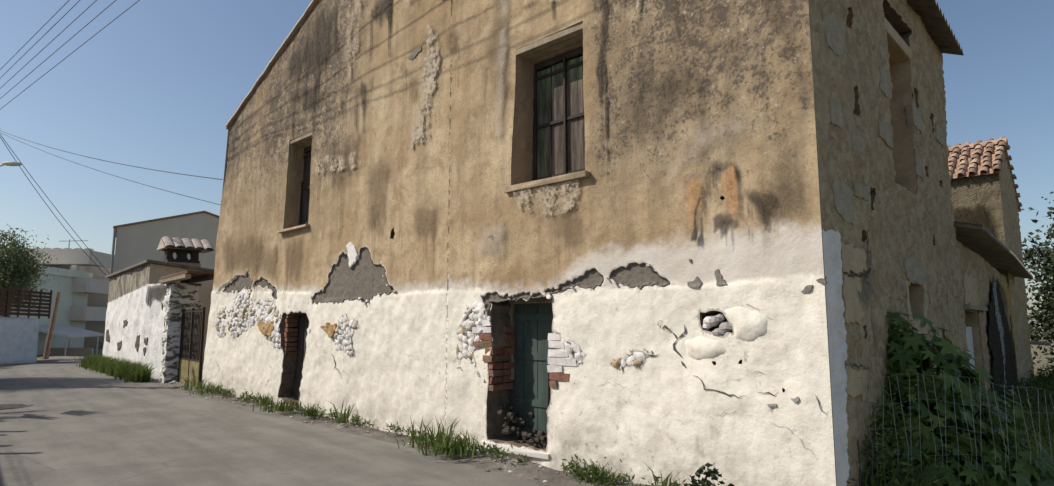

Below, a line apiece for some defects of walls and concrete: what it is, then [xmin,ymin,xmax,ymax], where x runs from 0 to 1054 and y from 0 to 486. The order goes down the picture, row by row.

peeling [407,24,440,148]
water stain [486,0,507,135]
water stain [596,0,610,163]
peeling [513,179,579,216]
water stain [691,162,737,242]
water stain [747,191,774,229]
flaking render [222,270,277,299]
flaking render [320,322,337,338]
flaking render [311,242,396,305]
flaking render [481,262,670,334]
flaking render [714,269,728,285]
crack [597,325,816,458]